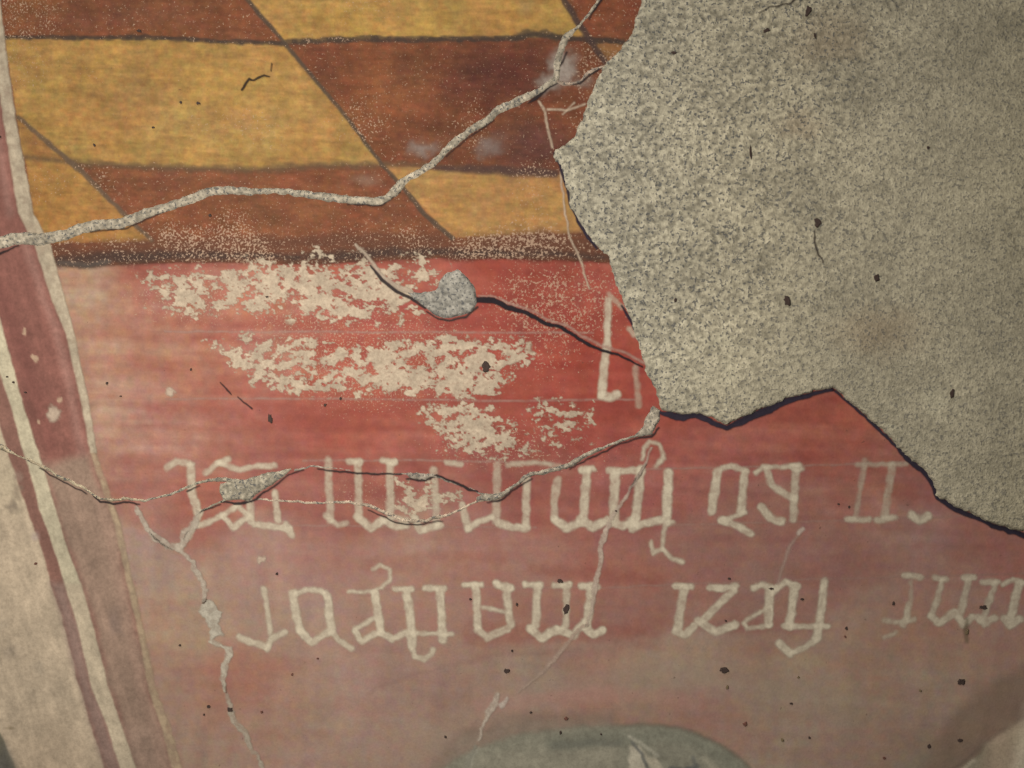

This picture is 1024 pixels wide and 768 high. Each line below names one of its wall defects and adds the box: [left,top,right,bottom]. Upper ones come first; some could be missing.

crack [0,0,604,288]
peeling [136,246,596,461]
crack [355,243,645,367]
peeling [553,0,1024,531]
crack [0,388,1024,768]